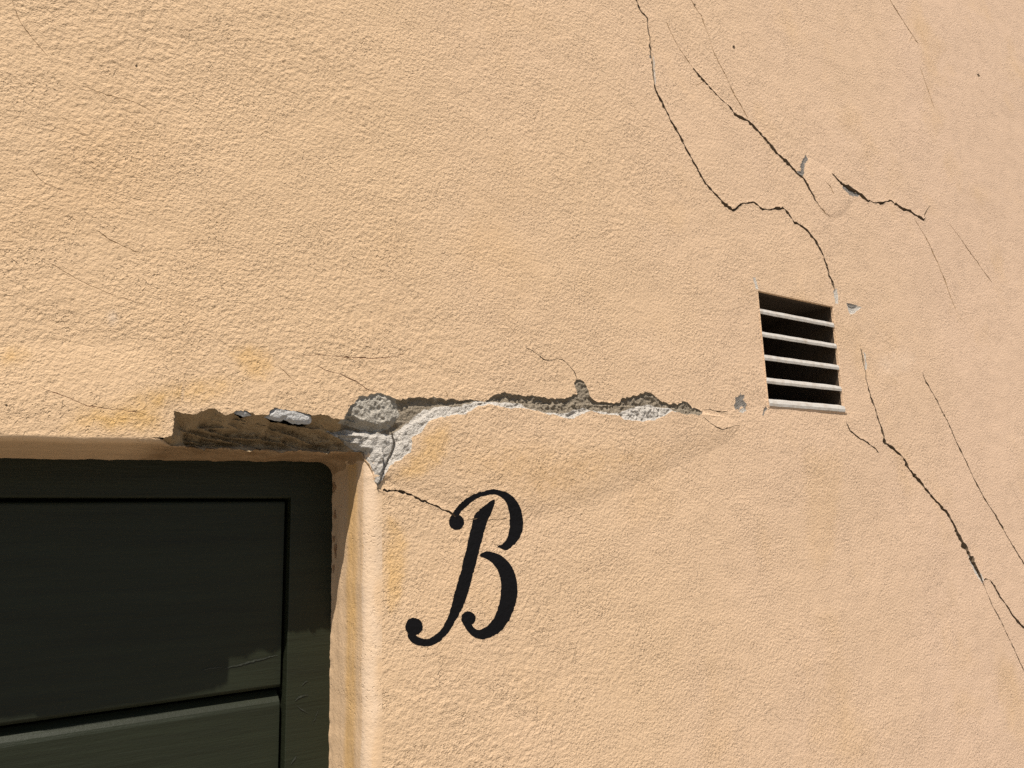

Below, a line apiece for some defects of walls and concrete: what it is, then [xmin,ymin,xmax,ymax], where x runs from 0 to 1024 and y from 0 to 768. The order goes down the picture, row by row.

crack [636,0,956,309]
crack [376,433,455,516]
spalling [163,379,703,484]
crack [846,350,1024,670]